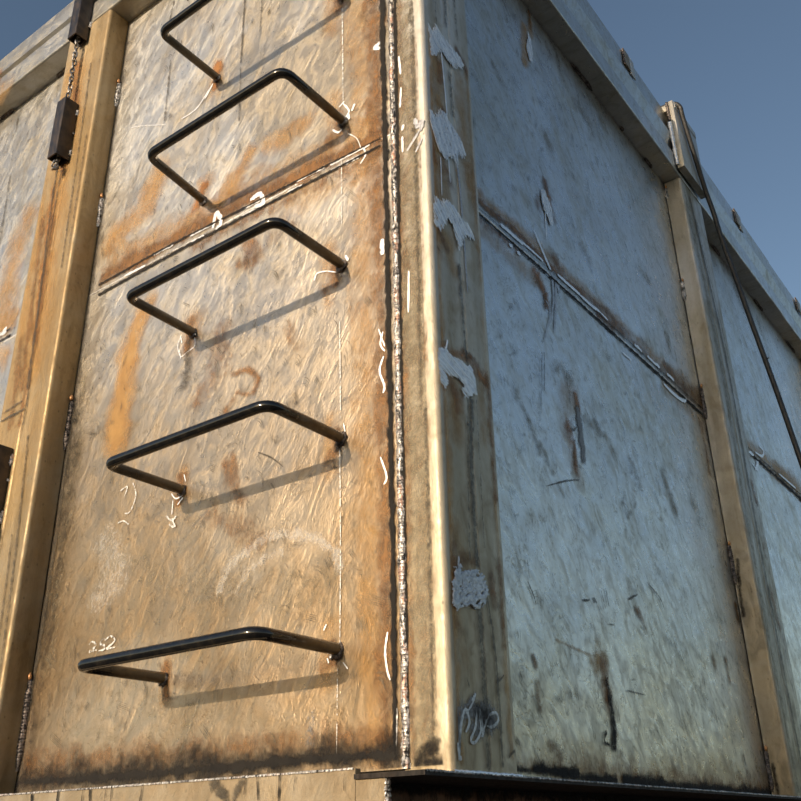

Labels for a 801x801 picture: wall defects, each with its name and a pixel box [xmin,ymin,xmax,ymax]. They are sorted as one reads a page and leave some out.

rust [430,54,445,114]
rust [100,129,383,281]
rust [107,300,154,453]
rust [182,317,194,386]
rust [232,367,259,395]
rust [440,315,493,424]
rust [475,190,702,406]
rust [566,420,578,474]